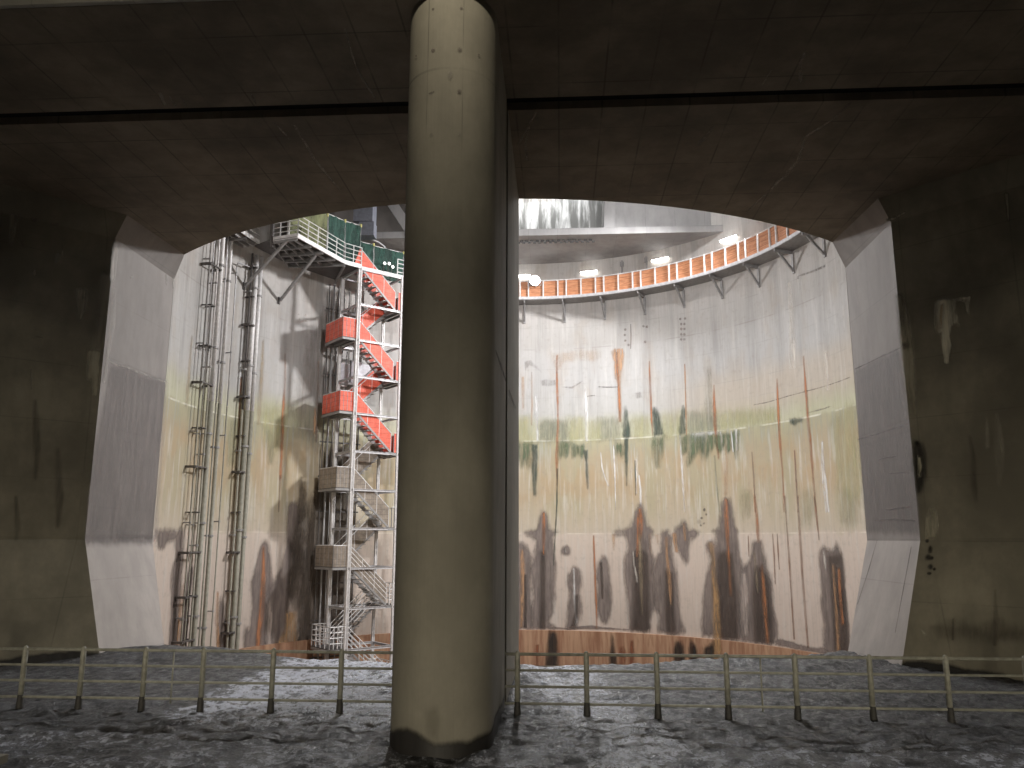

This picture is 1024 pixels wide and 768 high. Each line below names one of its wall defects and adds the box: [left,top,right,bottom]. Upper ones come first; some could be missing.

corrosion [613,349,624,410]
damp [935,297,970,364]
damp [322,447,349,468]
corrosion [777,386,797,501]
damp [244,482,353,648]
damp [519,467,850,666]